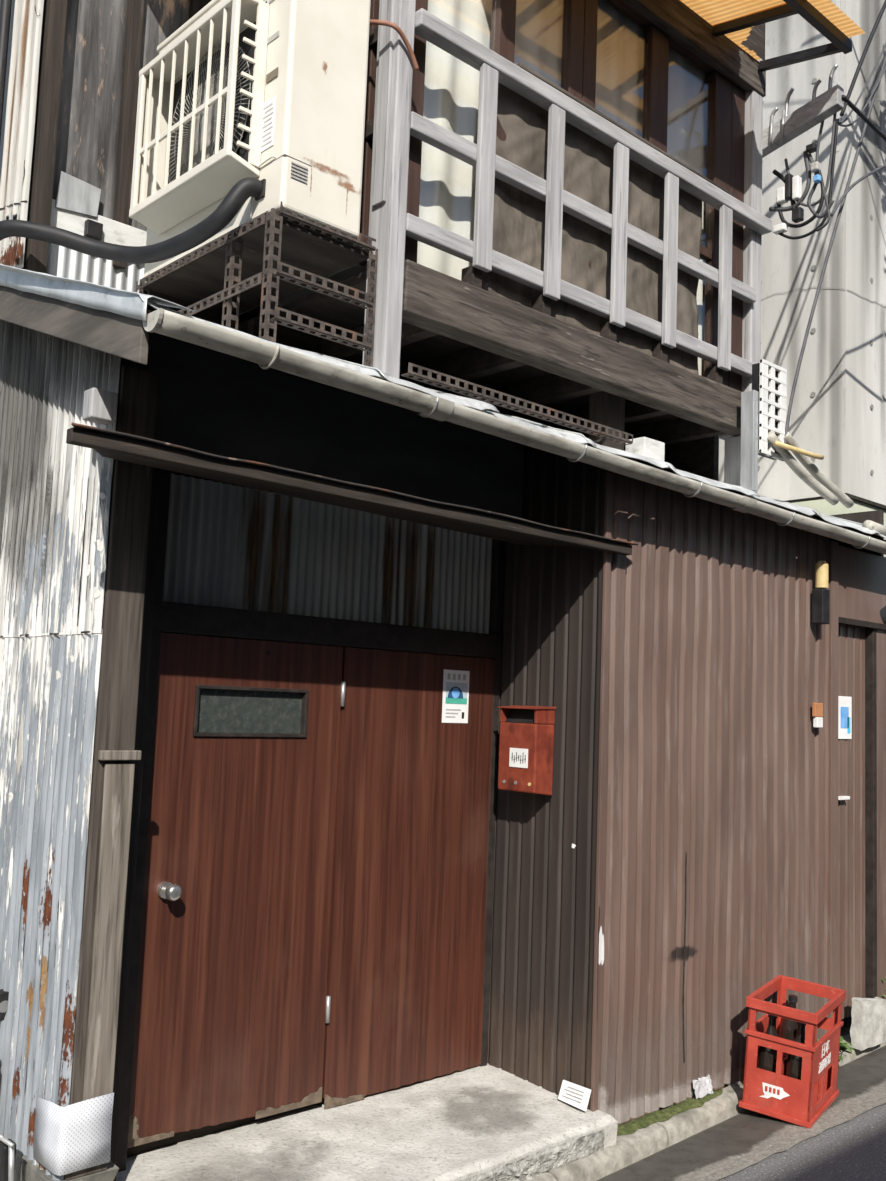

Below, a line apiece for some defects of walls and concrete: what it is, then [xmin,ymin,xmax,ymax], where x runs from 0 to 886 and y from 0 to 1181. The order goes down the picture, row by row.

water stain [0,322,68,555]
peeling [0,463,111,1181]
corrosion [11,849,61,1150]
corrosion [57,980,76,1106]
water stain [828,1046,886,1108]
spalling [460,1130,605,1181]
water stain [597,1110,790,1181]